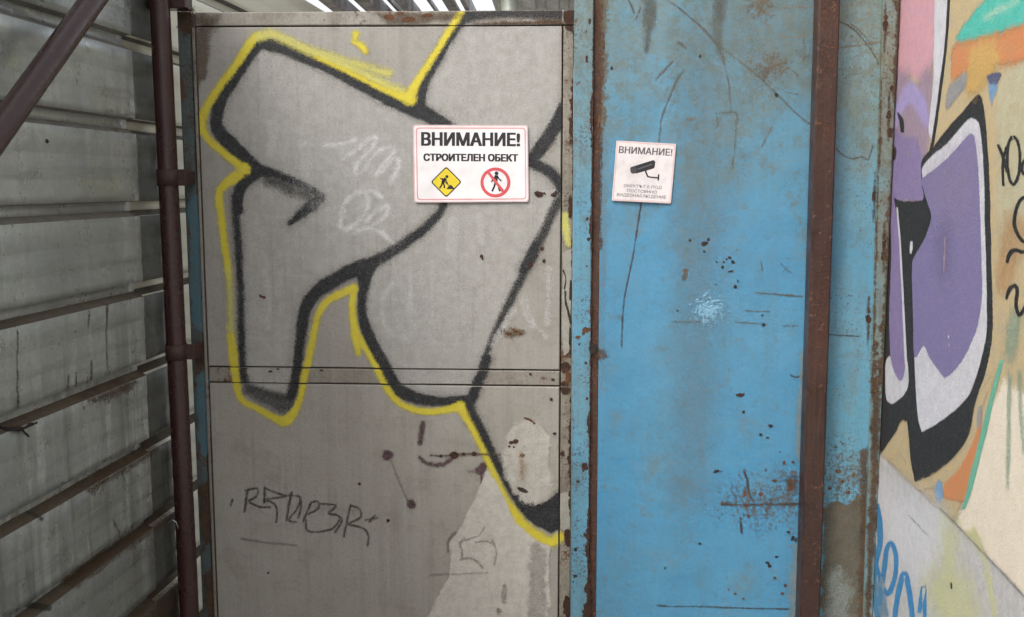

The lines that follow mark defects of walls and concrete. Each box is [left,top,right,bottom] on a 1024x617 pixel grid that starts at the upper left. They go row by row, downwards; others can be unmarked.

corrosion [563,0,610,617]
corrosion [823,0,900,617]
peeling [428,413,589,617]
corrosion [550,350,571,515]
corrosion [712,449,800,538]